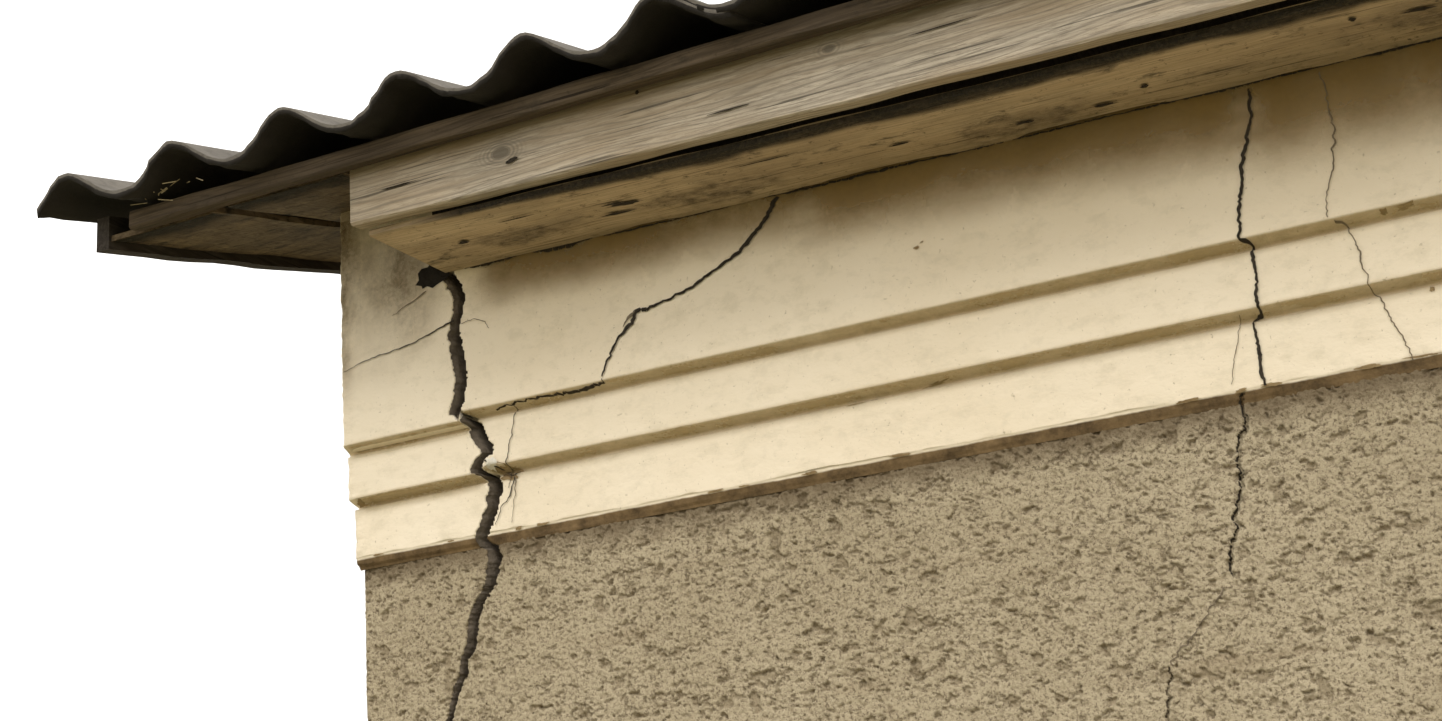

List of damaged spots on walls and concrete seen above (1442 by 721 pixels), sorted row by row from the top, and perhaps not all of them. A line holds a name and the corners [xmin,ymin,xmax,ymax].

crack [345,37,1442,721]